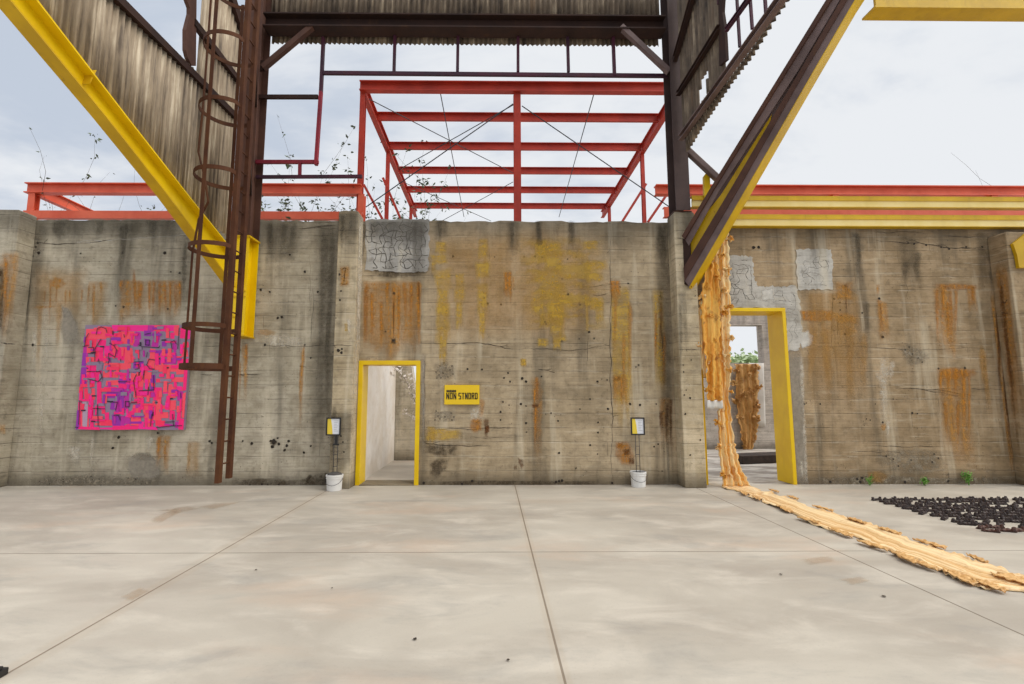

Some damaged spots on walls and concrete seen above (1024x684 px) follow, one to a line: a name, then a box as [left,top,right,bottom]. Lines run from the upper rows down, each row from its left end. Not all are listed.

corrosion [364,283,421,353]
crack [419,241,627,478]
crack [802,257,989,350]